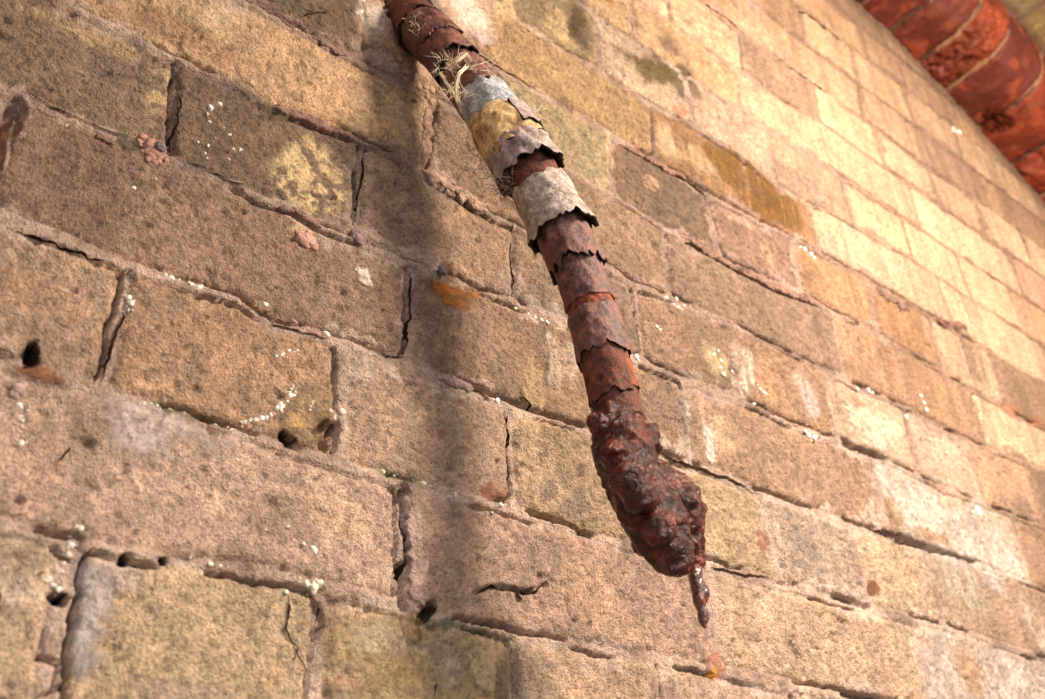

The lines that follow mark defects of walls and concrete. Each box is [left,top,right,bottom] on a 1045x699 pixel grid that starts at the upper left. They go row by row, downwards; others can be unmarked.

rust [432,262,479,309]
crack [362,275,412,358]
crack [474,580,548,600]
crack [285,596,320,680]
rust [704,652,726,680]